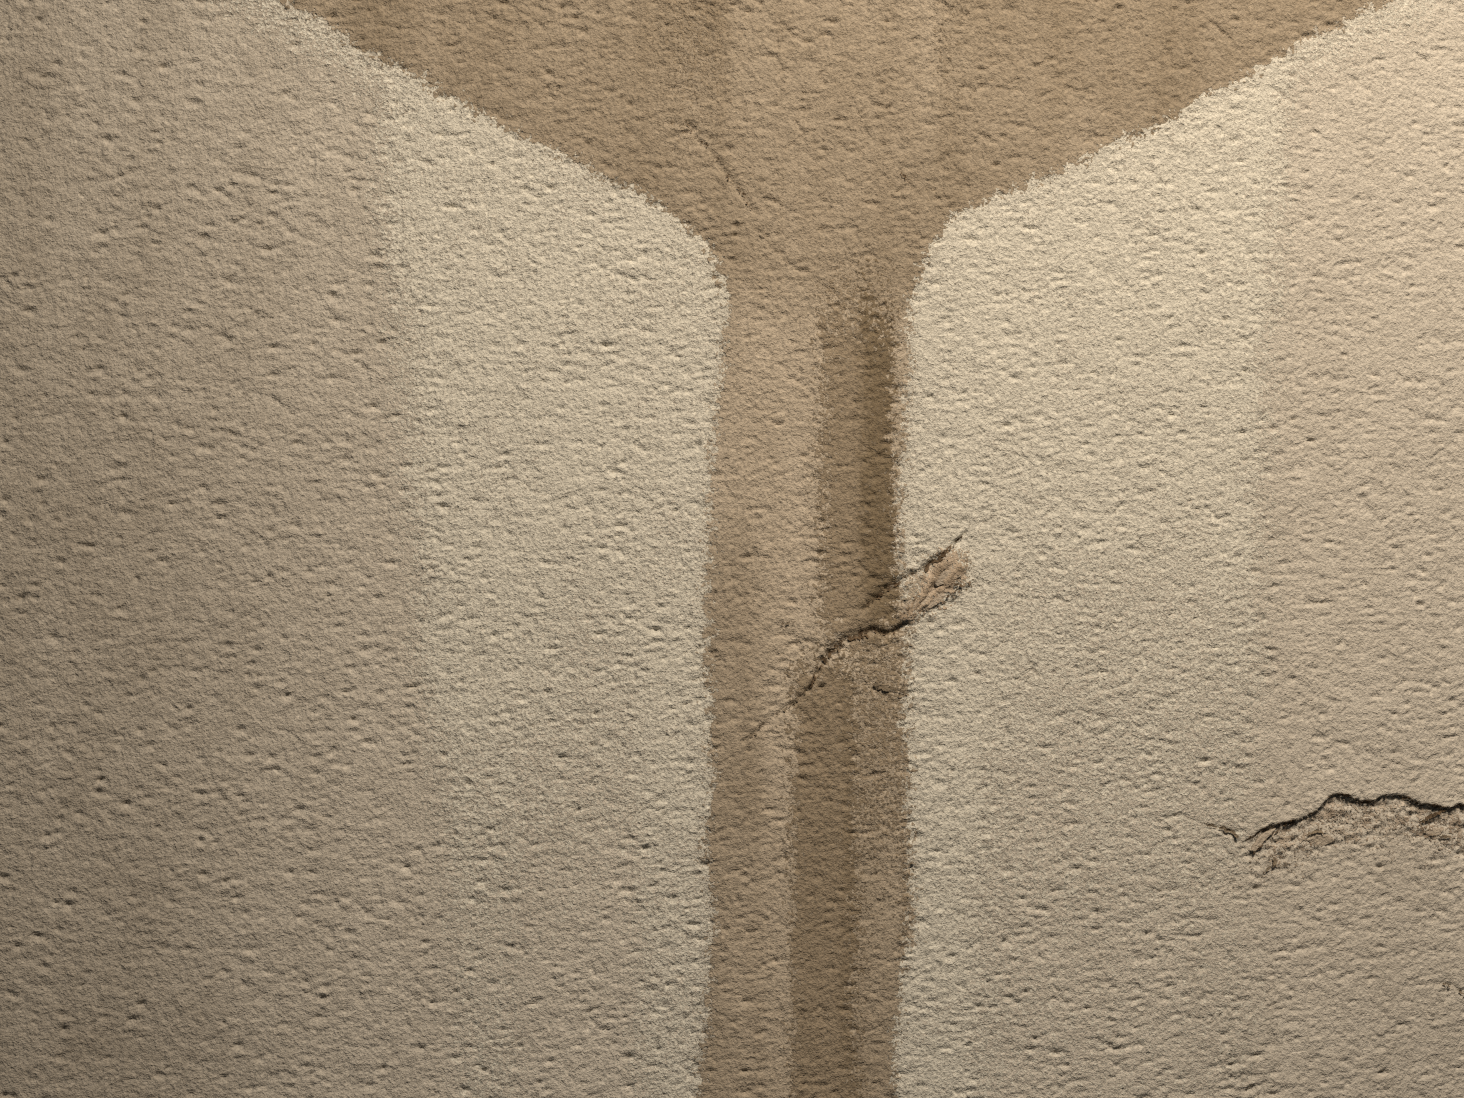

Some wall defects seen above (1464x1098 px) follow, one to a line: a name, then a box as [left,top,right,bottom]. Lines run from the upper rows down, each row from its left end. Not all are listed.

crack [749,536,963,738]
crack [1206,793,1464,872]